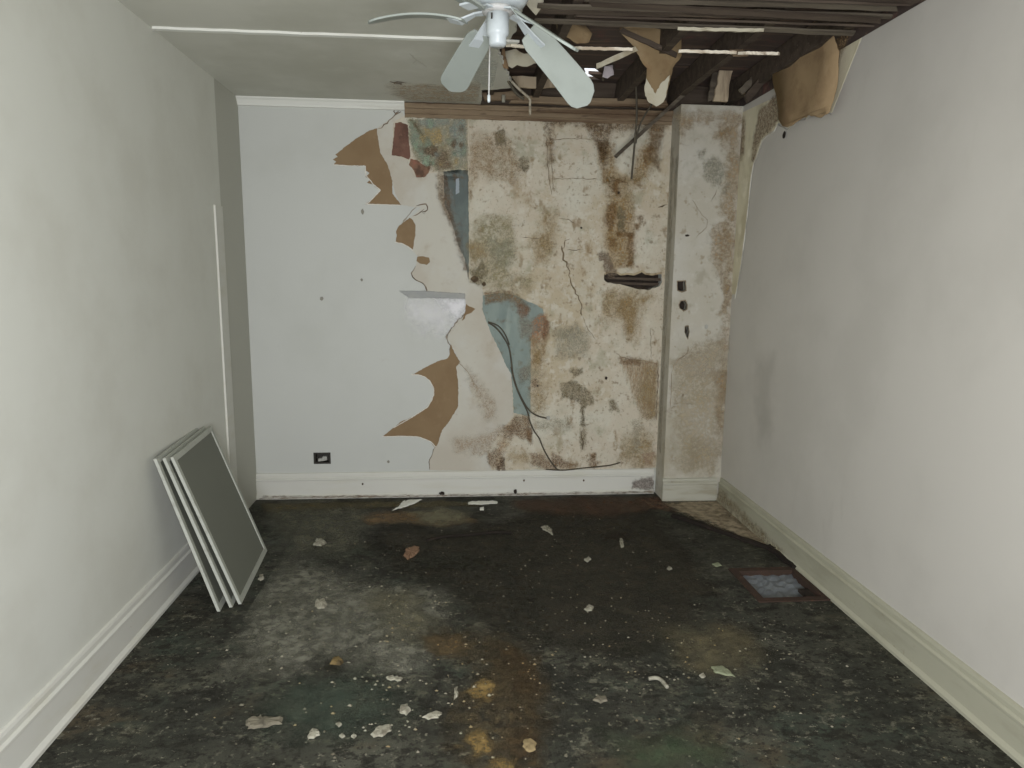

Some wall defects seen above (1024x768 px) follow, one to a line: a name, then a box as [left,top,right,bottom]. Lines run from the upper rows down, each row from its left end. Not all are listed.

flaking render [828,36,861,114]
damp [437,175,530,287]
damp [472,129,529,182]
flaking render [333,113,688,471]
damp [551,122,663,168]
crack [546,137,693,420]
damp [681,114,739,304]
flaking render [732,95,810,299]
damp [488,416,532,471]
damp [561,369,593,446]